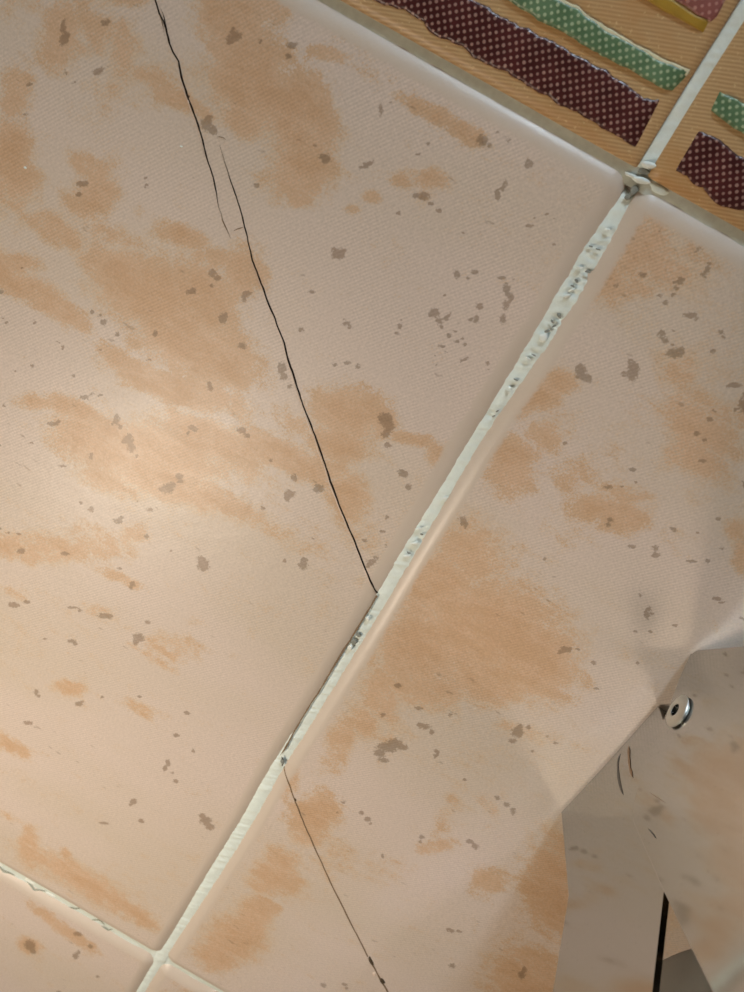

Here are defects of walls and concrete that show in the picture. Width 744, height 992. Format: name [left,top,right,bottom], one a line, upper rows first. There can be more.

crack [155,0,388,992]